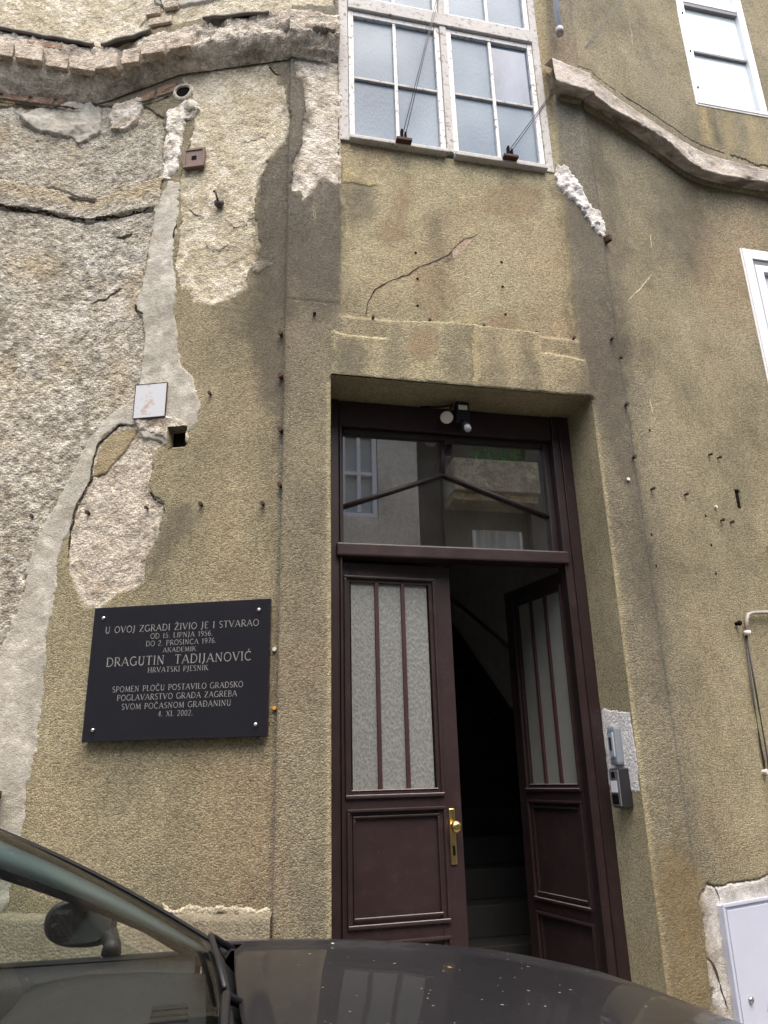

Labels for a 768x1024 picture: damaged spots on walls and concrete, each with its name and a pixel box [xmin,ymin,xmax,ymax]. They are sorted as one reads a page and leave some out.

flaking render [0,0,334,77]
peeling [290,48,376,200]
crack [0,179,150,239]
water stain [253,62,342,399]
crack [92,288,143,314]
crack [366,232,480,313]
flaking render [0,65,290,649]